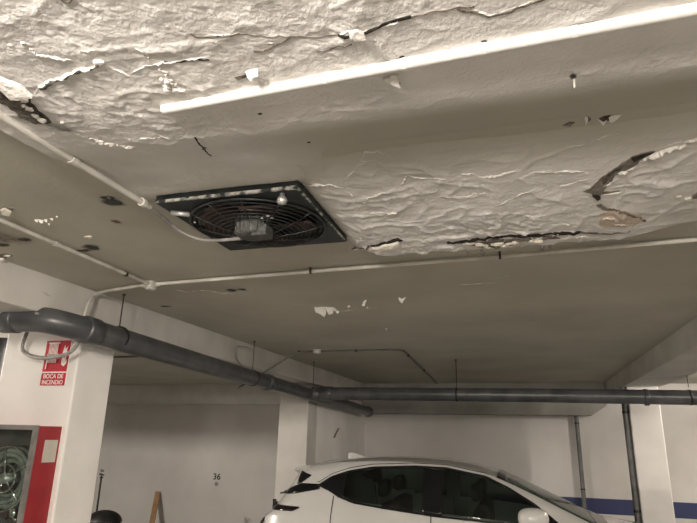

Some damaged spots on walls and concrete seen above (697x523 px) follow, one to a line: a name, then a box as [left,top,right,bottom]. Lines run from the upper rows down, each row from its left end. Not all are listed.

crack [189,0,545,53]
peeling [234,68,258,81]
peeling [383,74,401,89]
flaking render [0,76,51,126]
peeling [584,114,622,126]
crack [304,138,697,252]
flaking render [596,204,646,228]
peeling [314,307,339,317]